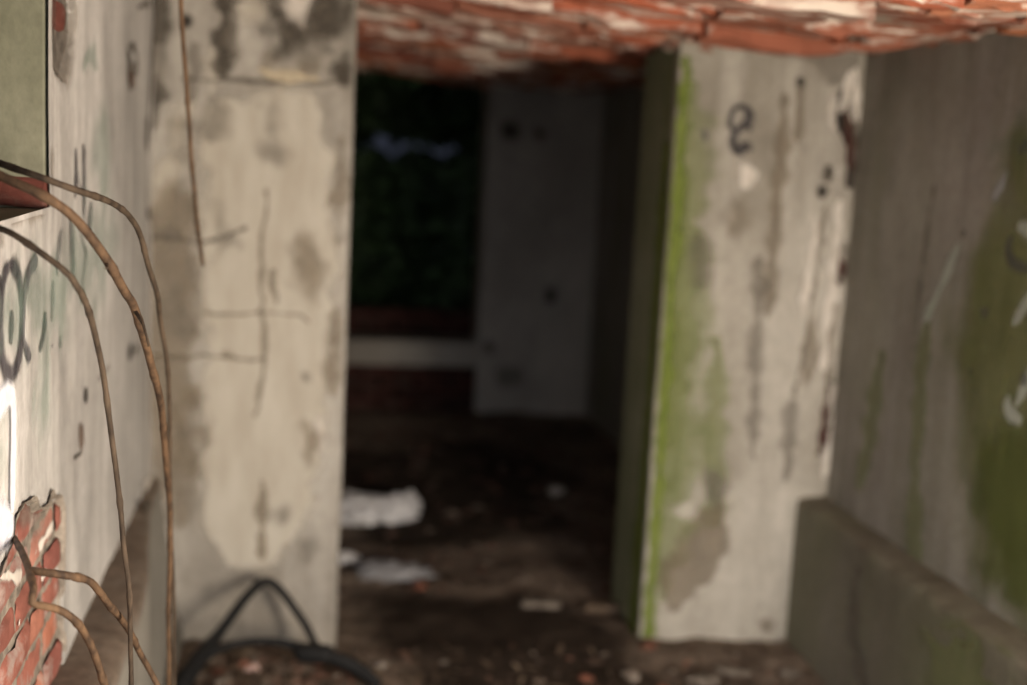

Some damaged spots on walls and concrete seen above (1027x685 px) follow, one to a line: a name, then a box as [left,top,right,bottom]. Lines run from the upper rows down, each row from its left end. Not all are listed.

leakage [211,0,353,77]
leakage [766,94,789,317]
flaking render [0,489,66,685]